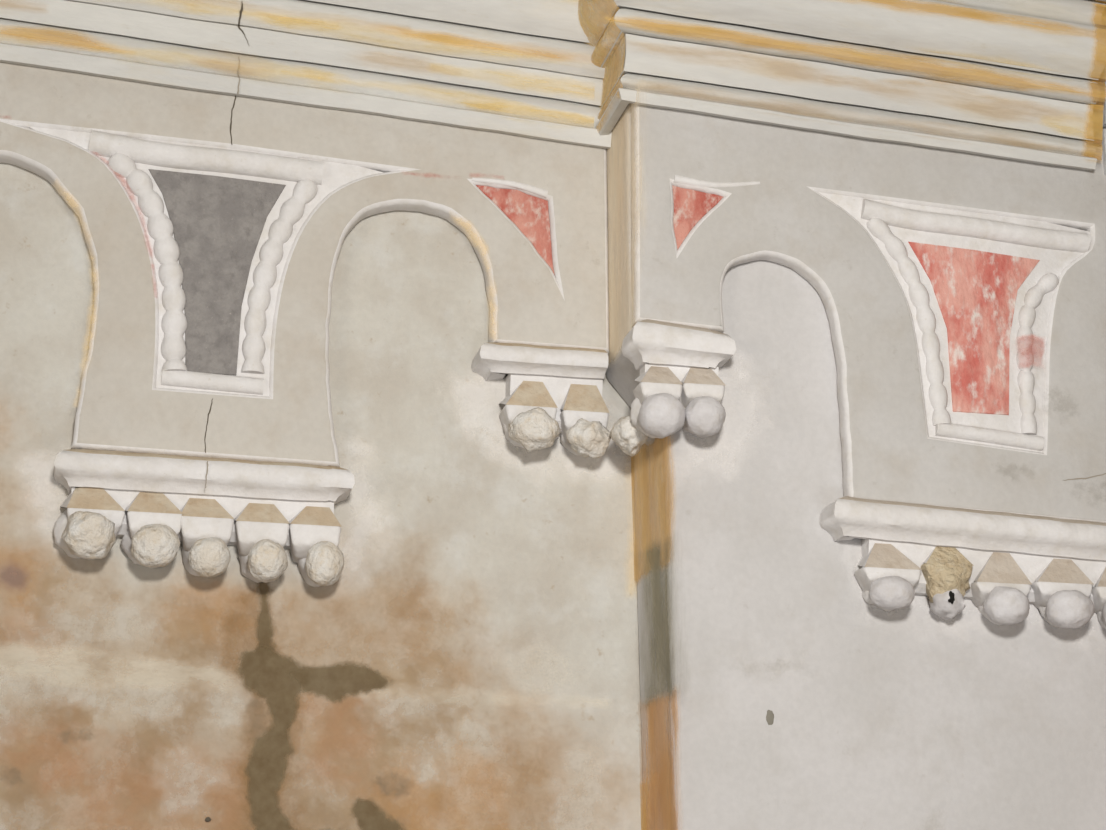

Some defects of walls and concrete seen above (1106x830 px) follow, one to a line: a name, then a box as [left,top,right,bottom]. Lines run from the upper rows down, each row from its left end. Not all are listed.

crack [230,2,248,144]
crack [204,399,213,488]
spalling [926,563,970,619]
water stain [0,566,563,830]